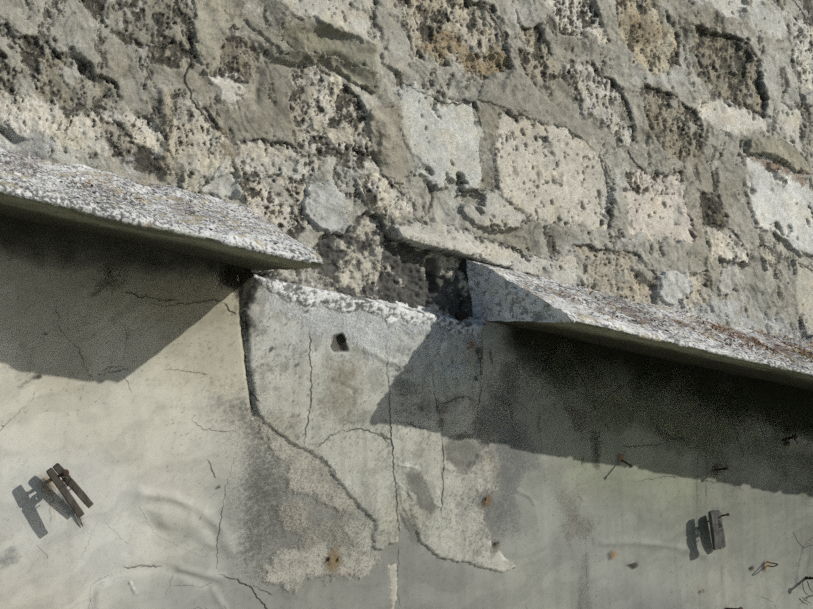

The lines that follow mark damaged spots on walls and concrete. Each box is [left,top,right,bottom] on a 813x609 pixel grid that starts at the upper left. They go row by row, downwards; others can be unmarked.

crack [126,289,259,406]
crack [269,327,484,531]
peeling [242,279,517,592]
water stain [445,326,813,532]
crack [127,564,204,595]
crack [208,460,272,609]
rust [325,551,340,571]
peeling [387,563,398,609]